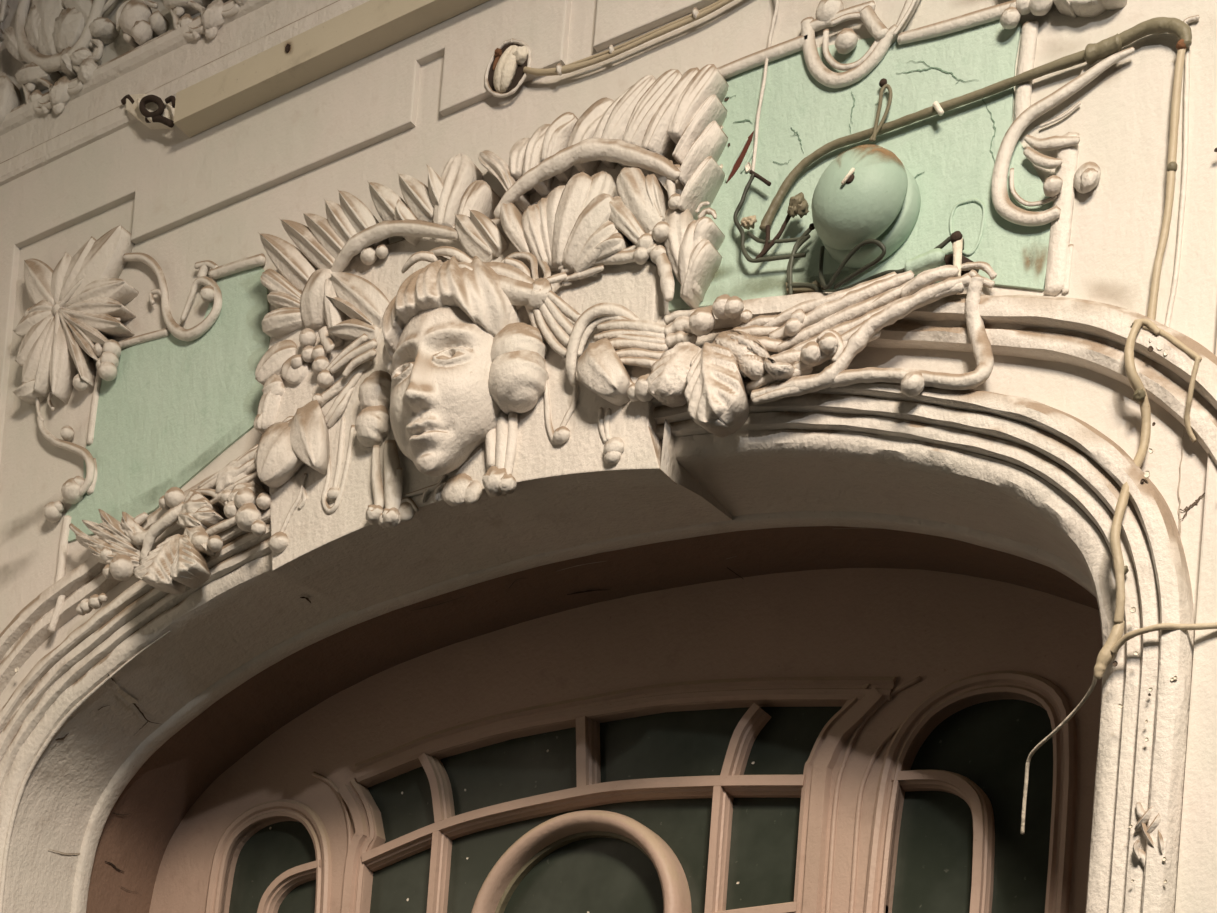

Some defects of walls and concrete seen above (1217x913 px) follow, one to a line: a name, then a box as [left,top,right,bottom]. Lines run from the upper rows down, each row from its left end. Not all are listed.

crack [898,60,996,162]